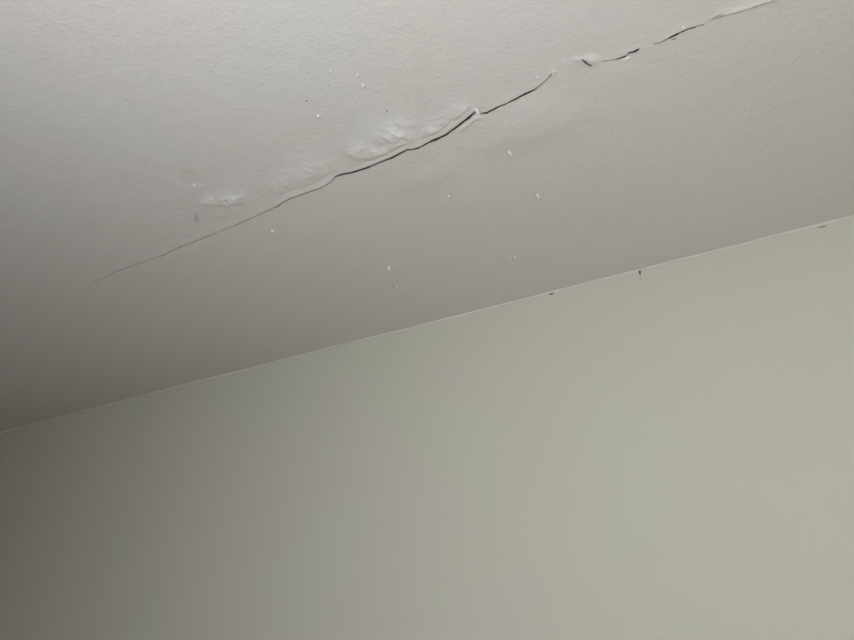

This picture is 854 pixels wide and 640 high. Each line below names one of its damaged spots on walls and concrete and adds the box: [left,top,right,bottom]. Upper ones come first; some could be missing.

crack [94,68,555,282]